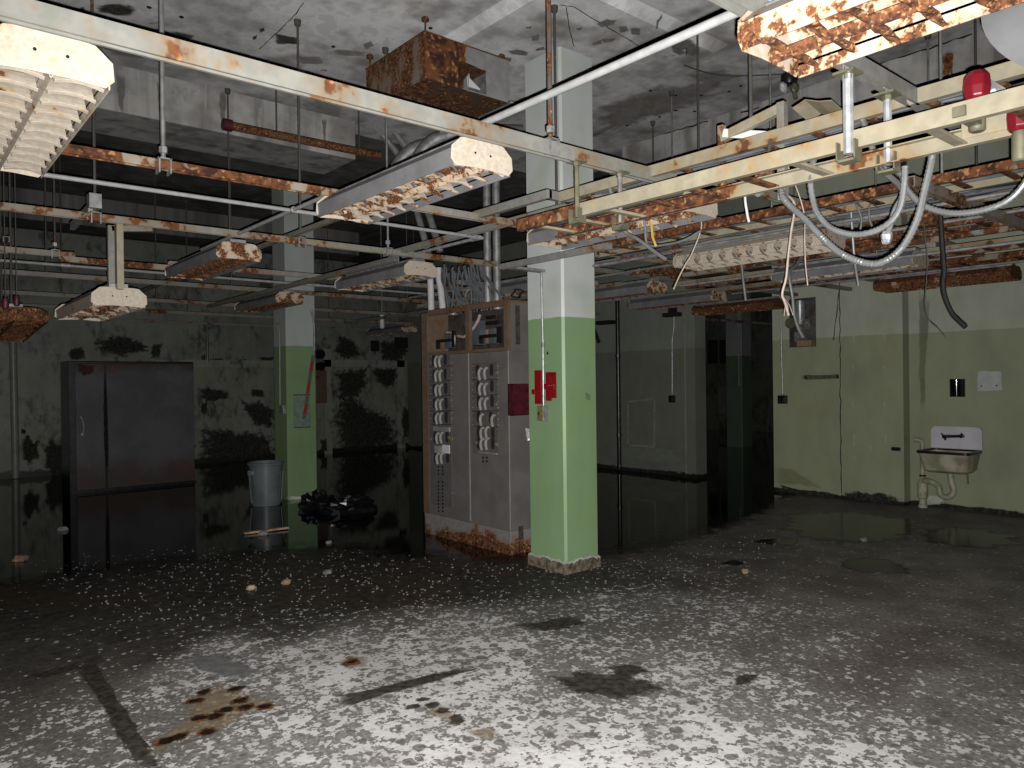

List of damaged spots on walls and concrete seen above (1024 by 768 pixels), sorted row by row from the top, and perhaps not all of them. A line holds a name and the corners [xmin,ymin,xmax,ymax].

damp [95,336,162,358]
damp [21,429,62,475]
damp [195,387,275,461]
damp [320,336,409,453]
damp [556,665,660,698]
rust [152,686,274,746]